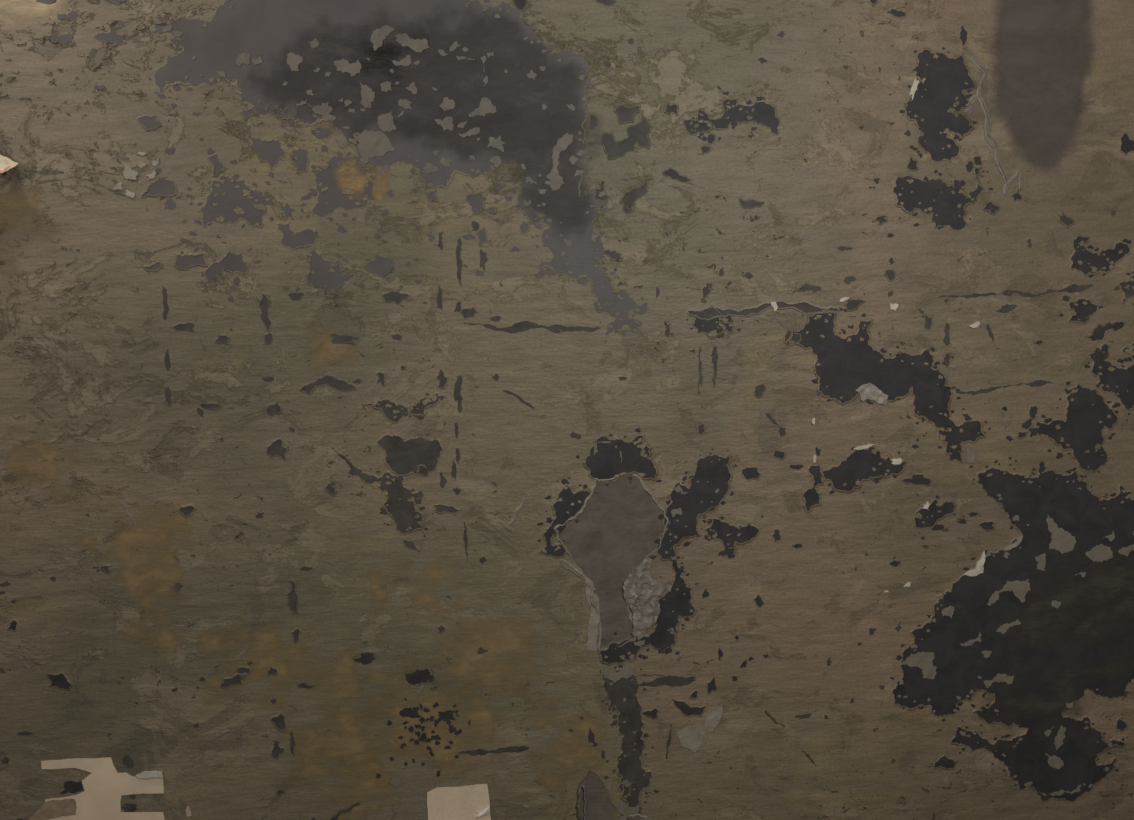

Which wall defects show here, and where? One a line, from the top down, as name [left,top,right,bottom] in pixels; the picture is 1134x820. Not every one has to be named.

spalling [5,0,127,71]
flaking render [112,0,660,336]
damp [267,19,588,226]
peeling [664,86,781,154]
peeling [872,26,1000,238]
damp [996,0,1091,167]
spalling [299,374,361,395]
peeling [348,368,486,563]
peeling [766,210,1134,813]
spalling [405,669,436,685]
spalling [387,698,471,766]
spalling [537,428,802,820]